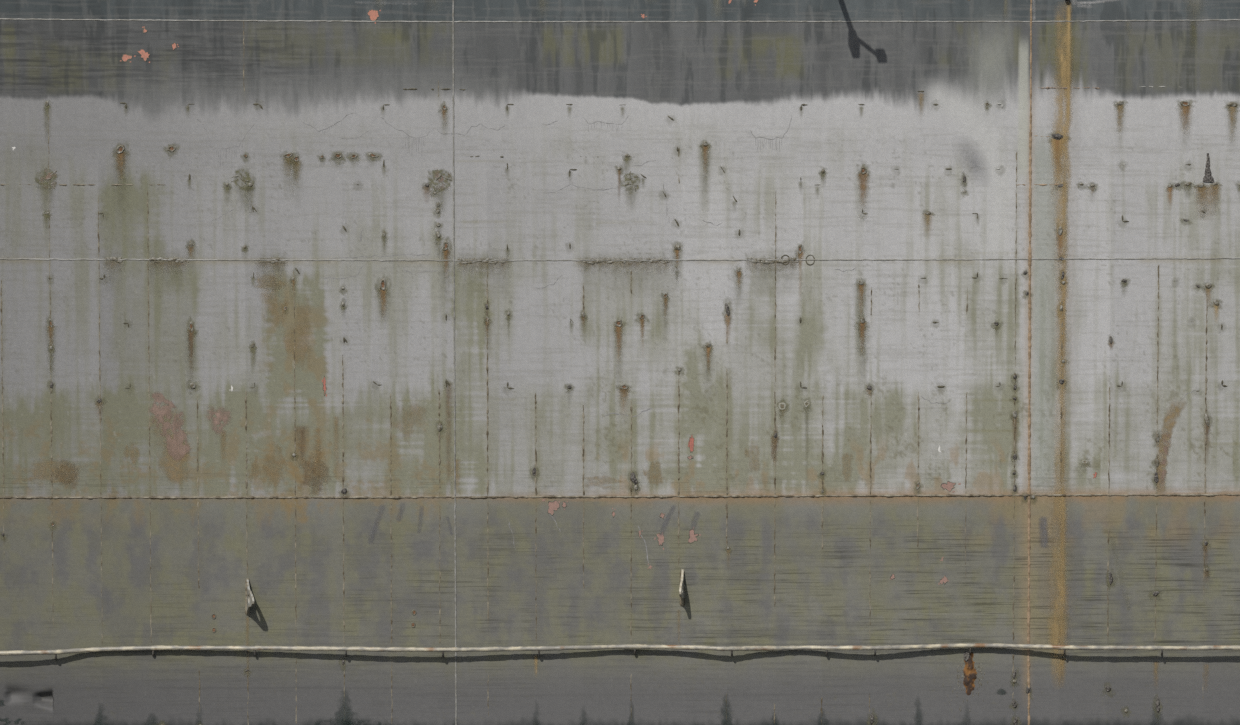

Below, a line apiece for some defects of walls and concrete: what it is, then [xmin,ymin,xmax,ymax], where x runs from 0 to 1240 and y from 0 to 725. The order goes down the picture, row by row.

peeling [120,49,150,63]
rust [1051,6,1070,161]
rust [1203,153,1214,195]
rust [1154,407,1180,489]
rust [950,650,988,718]